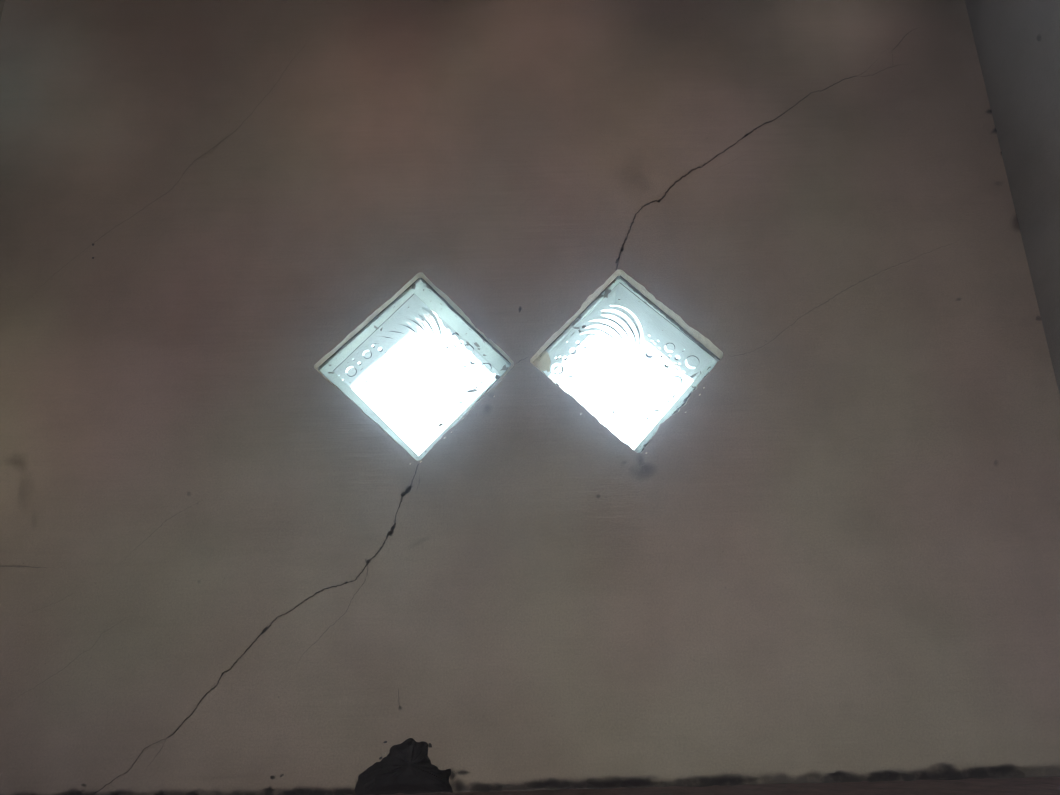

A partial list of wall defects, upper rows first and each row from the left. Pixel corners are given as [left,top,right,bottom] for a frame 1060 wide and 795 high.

crack [616,32,910,269]
crack [95,465,418,793]
spalling [355,738,467,795]